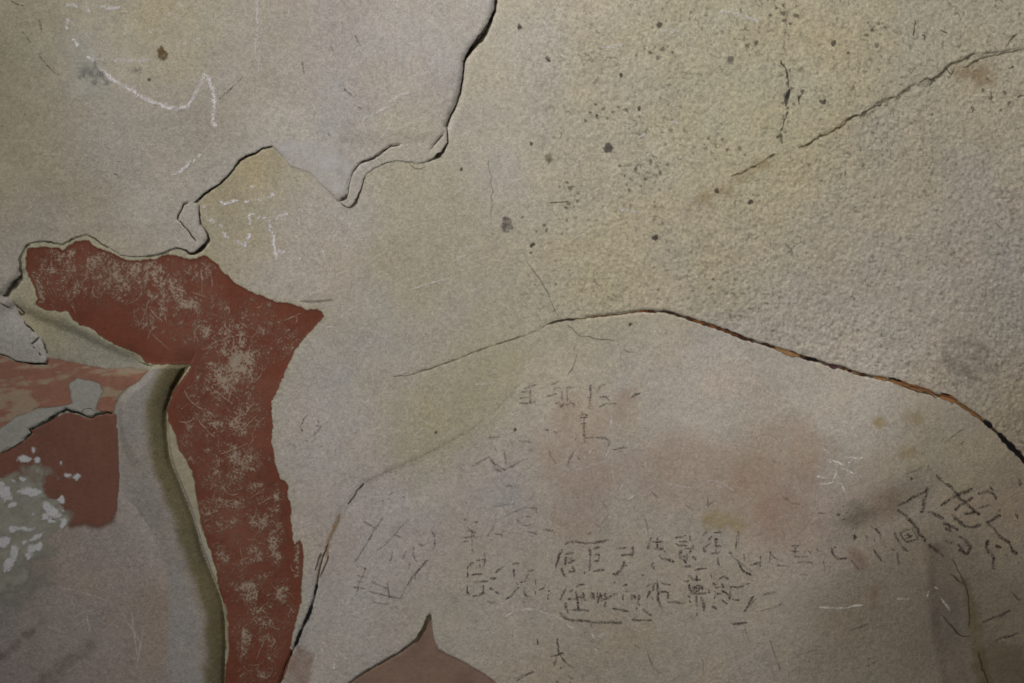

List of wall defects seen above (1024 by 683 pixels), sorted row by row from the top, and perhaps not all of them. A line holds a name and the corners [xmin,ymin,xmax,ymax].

crack [735,60,893,175]
crack [920,34,1021,86]
peeling [0,0,495,683]
crack [548,310,1024,463]
crack [279,483,364,683]